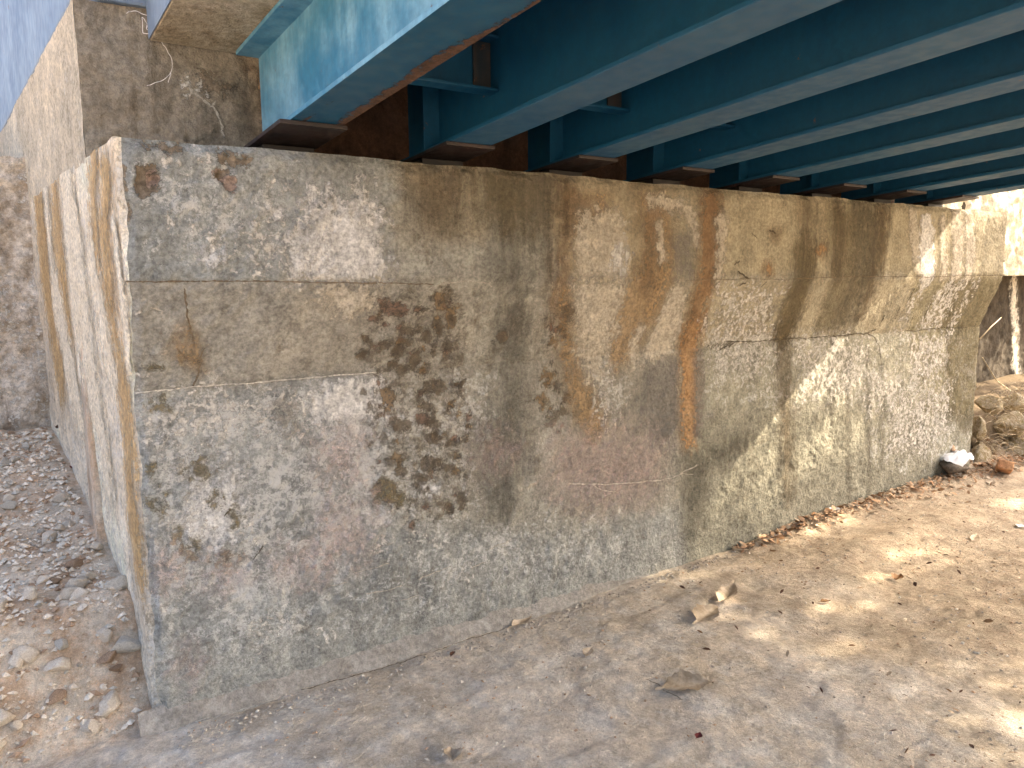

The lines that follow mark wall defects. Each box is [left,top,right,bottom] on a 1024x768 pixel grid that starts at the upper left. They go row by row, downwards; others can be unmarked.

corrosion [33,180,73,406]
corrosion [86,149,147,593]
corrosion [559,289,601,437]
corrosion [608,195,672,369]
efflorescence [646,192,699,265]
corrosion [679,192,724,448]
crack [726,329,881,357]
damp [699,196,980,497]
damp [360,481,465,553]
damp [245,612,336,655]